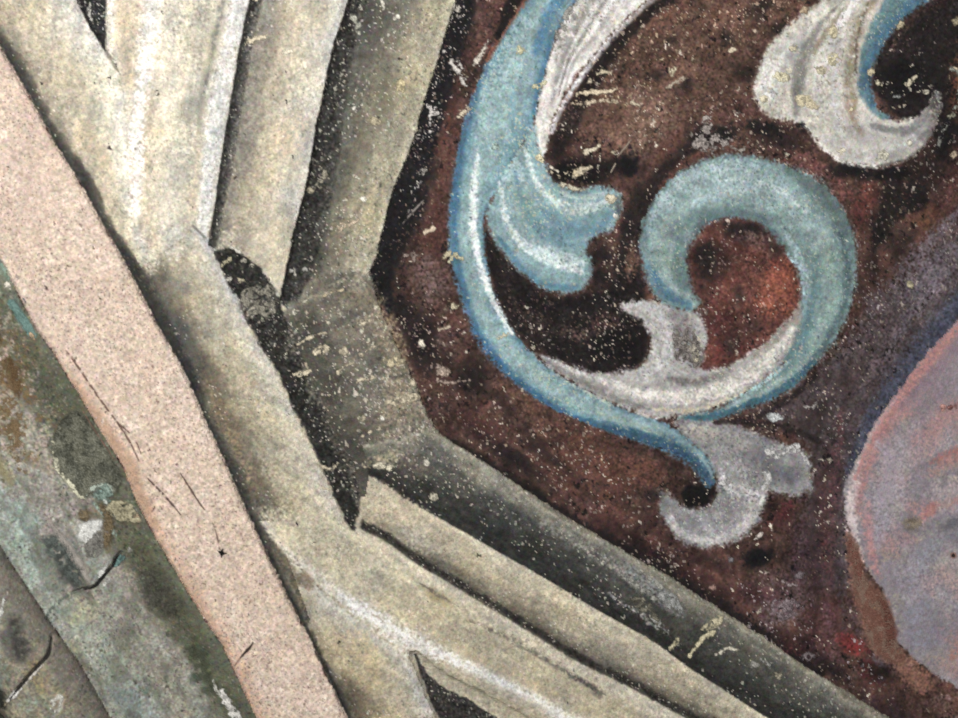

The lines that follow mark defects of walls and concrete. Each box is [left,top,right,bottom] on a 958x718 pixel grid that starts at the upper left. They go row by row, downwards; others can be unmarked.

crack [67,352,204,515]
crack [4,548,130,705]